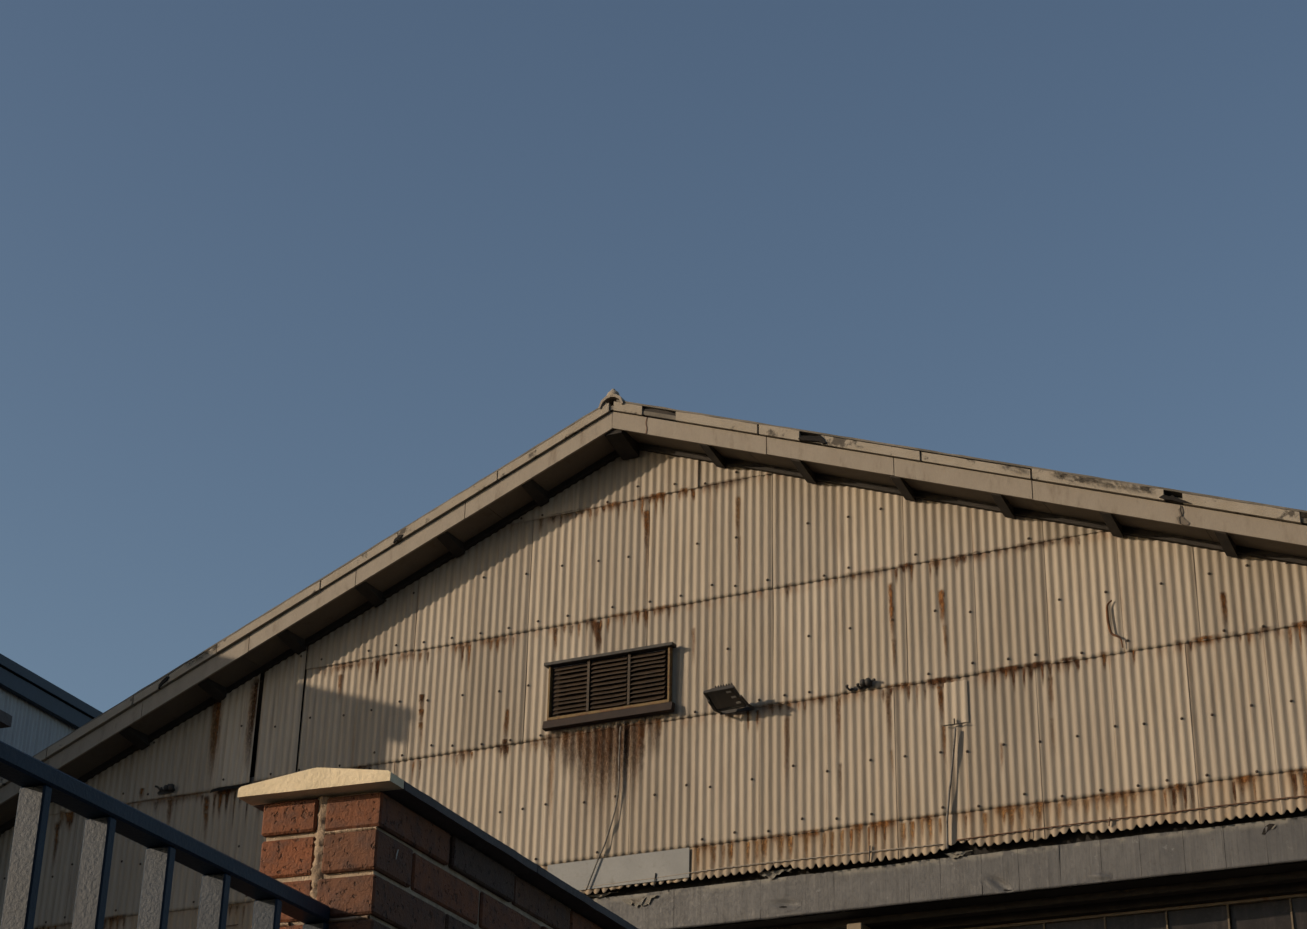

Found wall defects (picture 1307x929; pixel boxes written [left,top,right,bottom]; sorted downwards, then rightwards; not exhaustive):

rust [888,563,912,657]
rust [938,590,947,644]
rust [1239,621,1307,645]
rust [984,657,1079,694]
rust [210,702,222,754]
rust [500,710,509,754]
rust [882,677,953,747]
rust [983,791,1132,826]
rust [1163,784,1194,811]
rust [1232,775,1256,801]
rust [1291,773,1307,795]
rust [696,816,941,863]